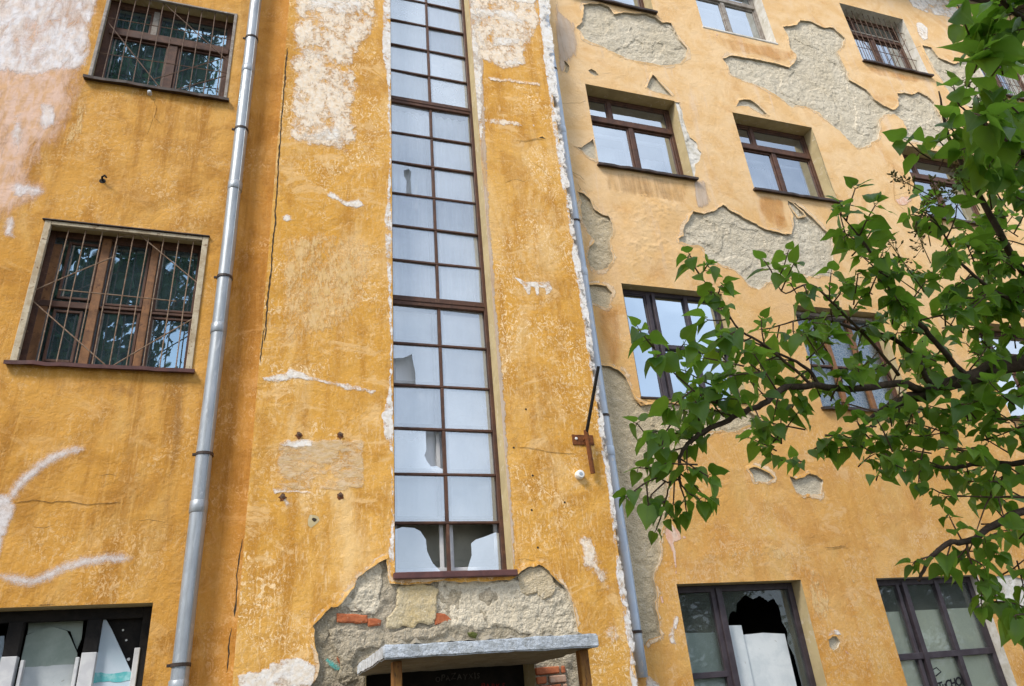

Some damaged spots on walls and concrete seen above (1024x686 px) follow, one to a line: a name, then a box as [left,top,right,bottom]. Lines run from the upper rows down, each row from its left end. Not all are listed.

peeling [290,0,391,148]
flaking render [722,19,948,149]
crack [260,51,288,362]
flaking render [676,200,835,290]
flaking render [309,0,761,686]
flaking render [744,463,824,500]
crack [227,540,243,670]